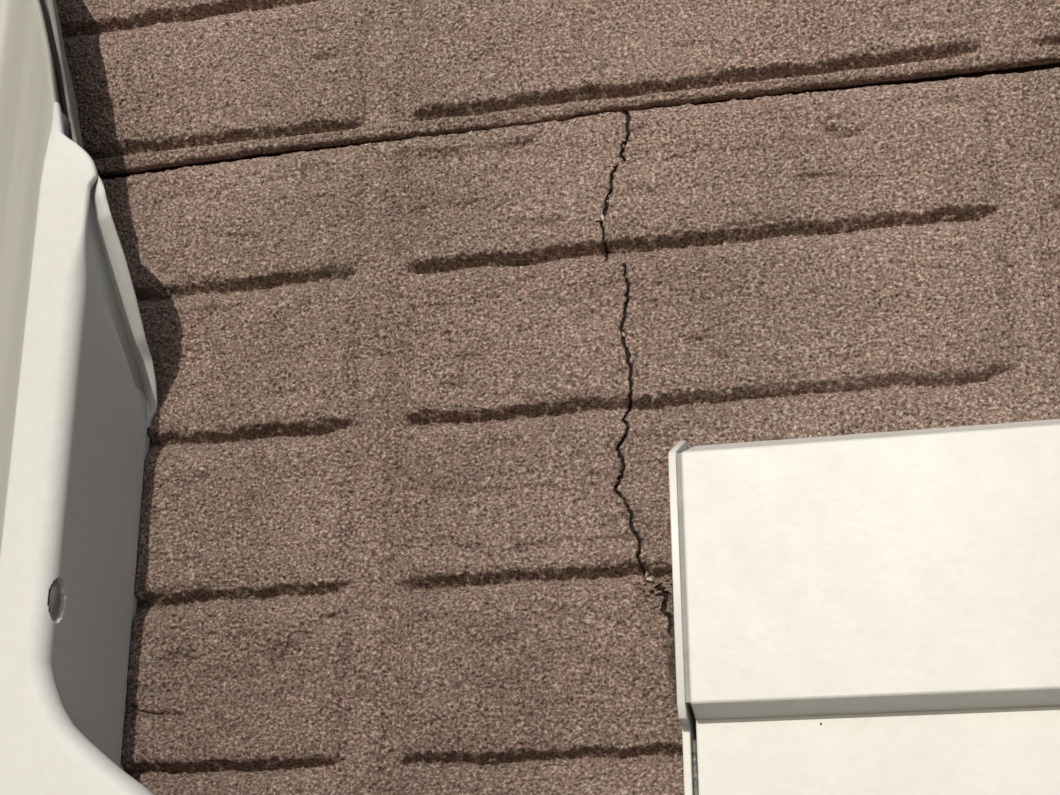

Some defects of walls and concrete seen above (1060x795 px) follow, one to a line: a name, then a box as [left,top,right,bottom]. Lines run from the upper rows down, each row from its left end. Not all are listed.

crack [596,109,673,635]